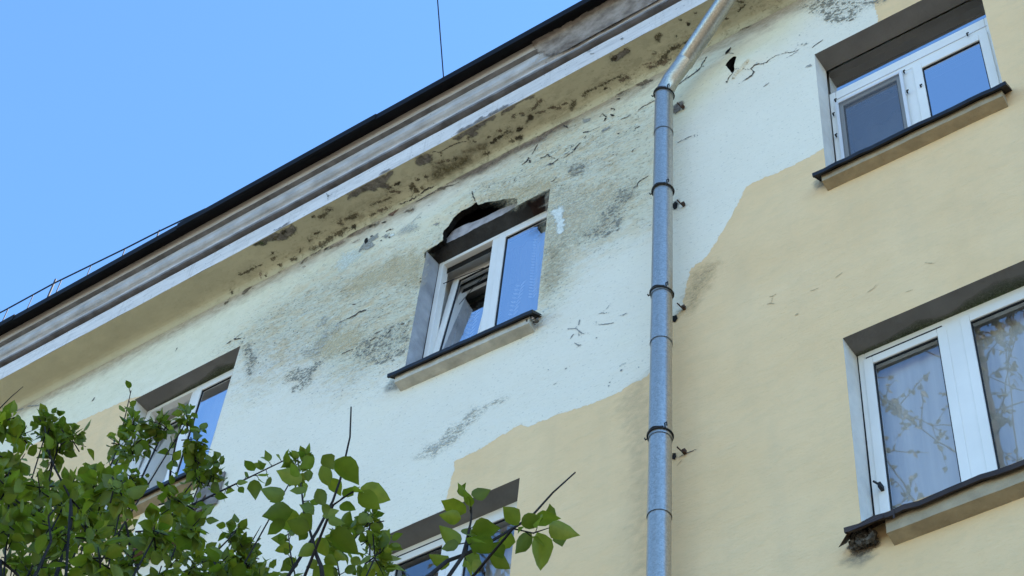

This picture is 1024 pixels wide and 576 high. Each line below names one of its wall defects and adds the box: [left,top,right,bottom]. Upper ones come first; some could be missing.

spalling [532,0,656,56]
flaking render [802,0,885,23]
crack [726,49,799,83]
spalling [238,33,686,277]
flaking render [282,316,341,392]
flaking render [354,320,411,364]
flaking render [417,399,501,458]